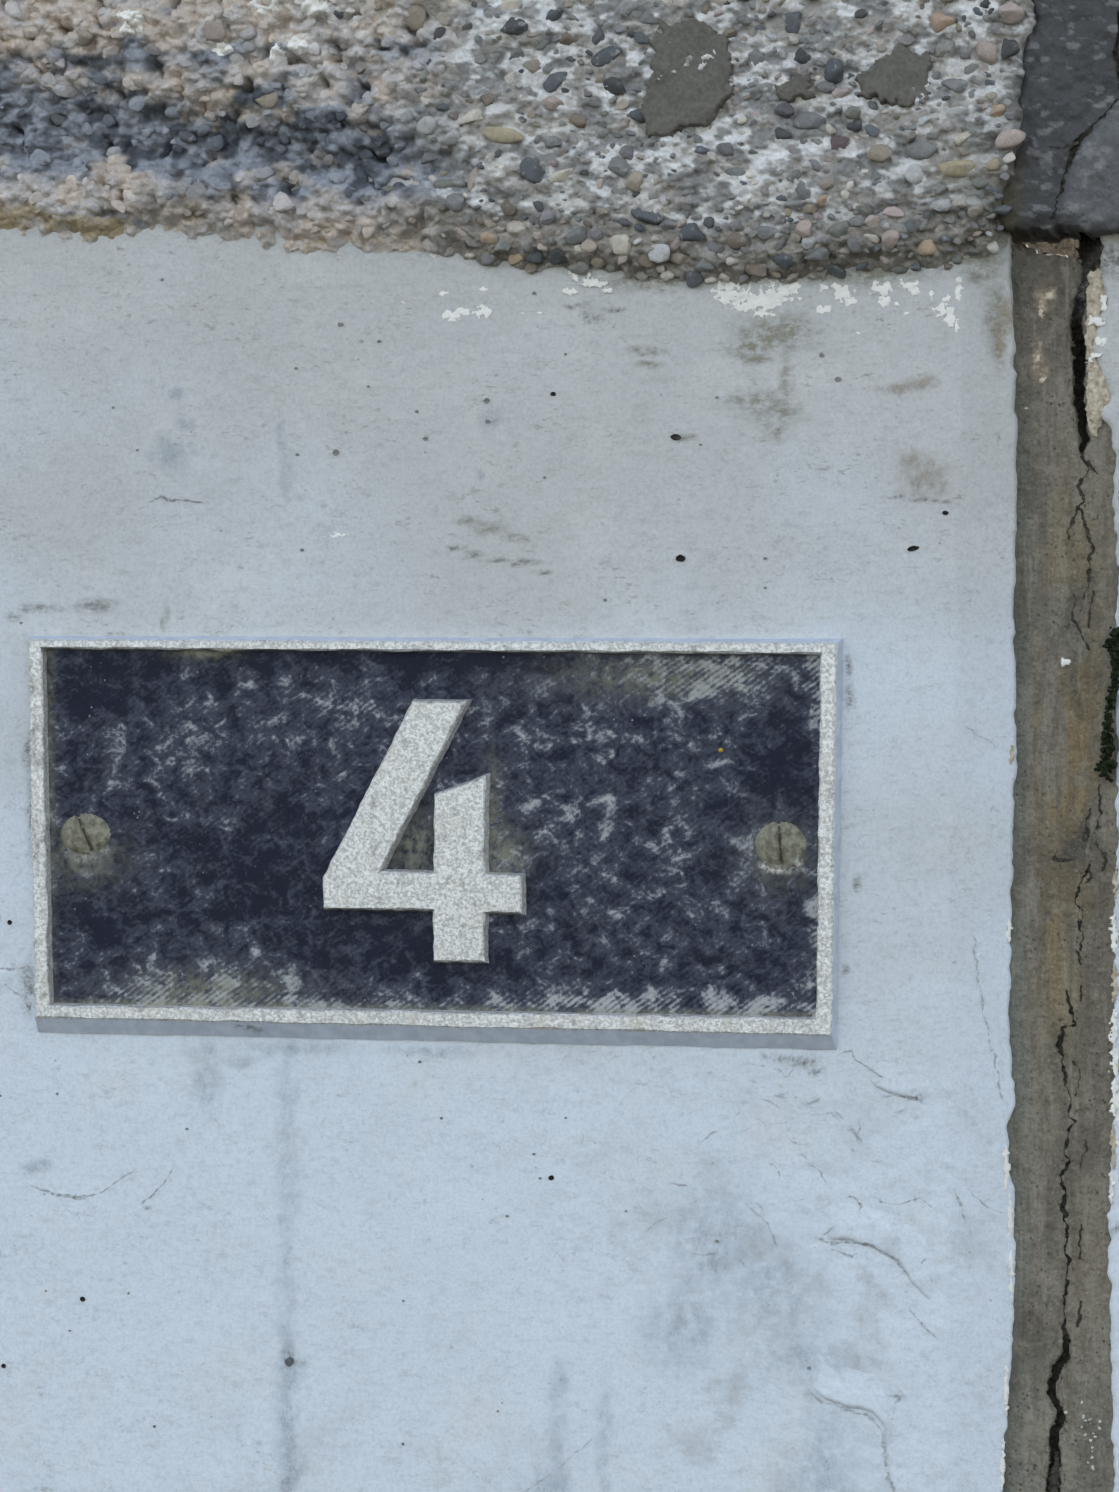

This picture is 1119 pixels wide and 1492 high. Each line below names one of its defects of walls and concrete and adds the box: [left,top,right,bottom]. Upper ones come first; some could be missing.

peeling [710,276,964,332]
crack [1049,12,1119,650]
spalling [1084,268,1111,436]
crack [1044,784,1108,1492]
crack [820,1231,905,1272]
crack [810,1393,901,1487]